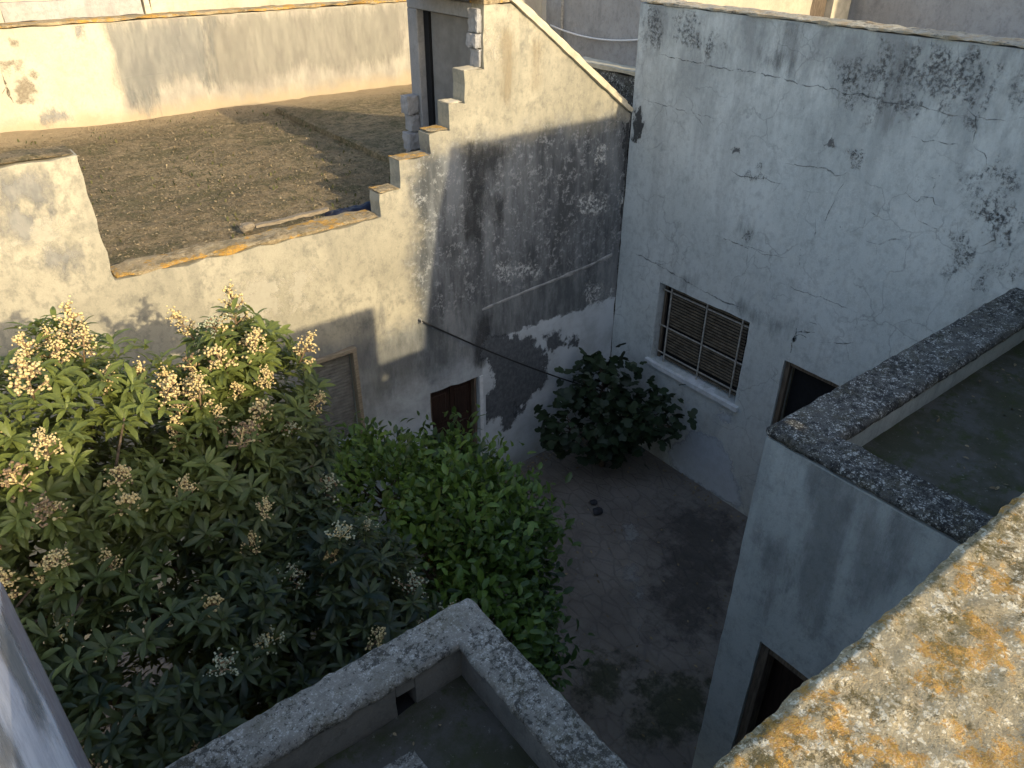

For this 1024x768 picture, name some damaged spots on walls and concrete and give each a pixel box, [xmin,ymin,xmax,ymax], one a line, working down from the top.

spalling [15,71,37,104]
leakage [465,144,503,238]
peeling [479,331,579,432]